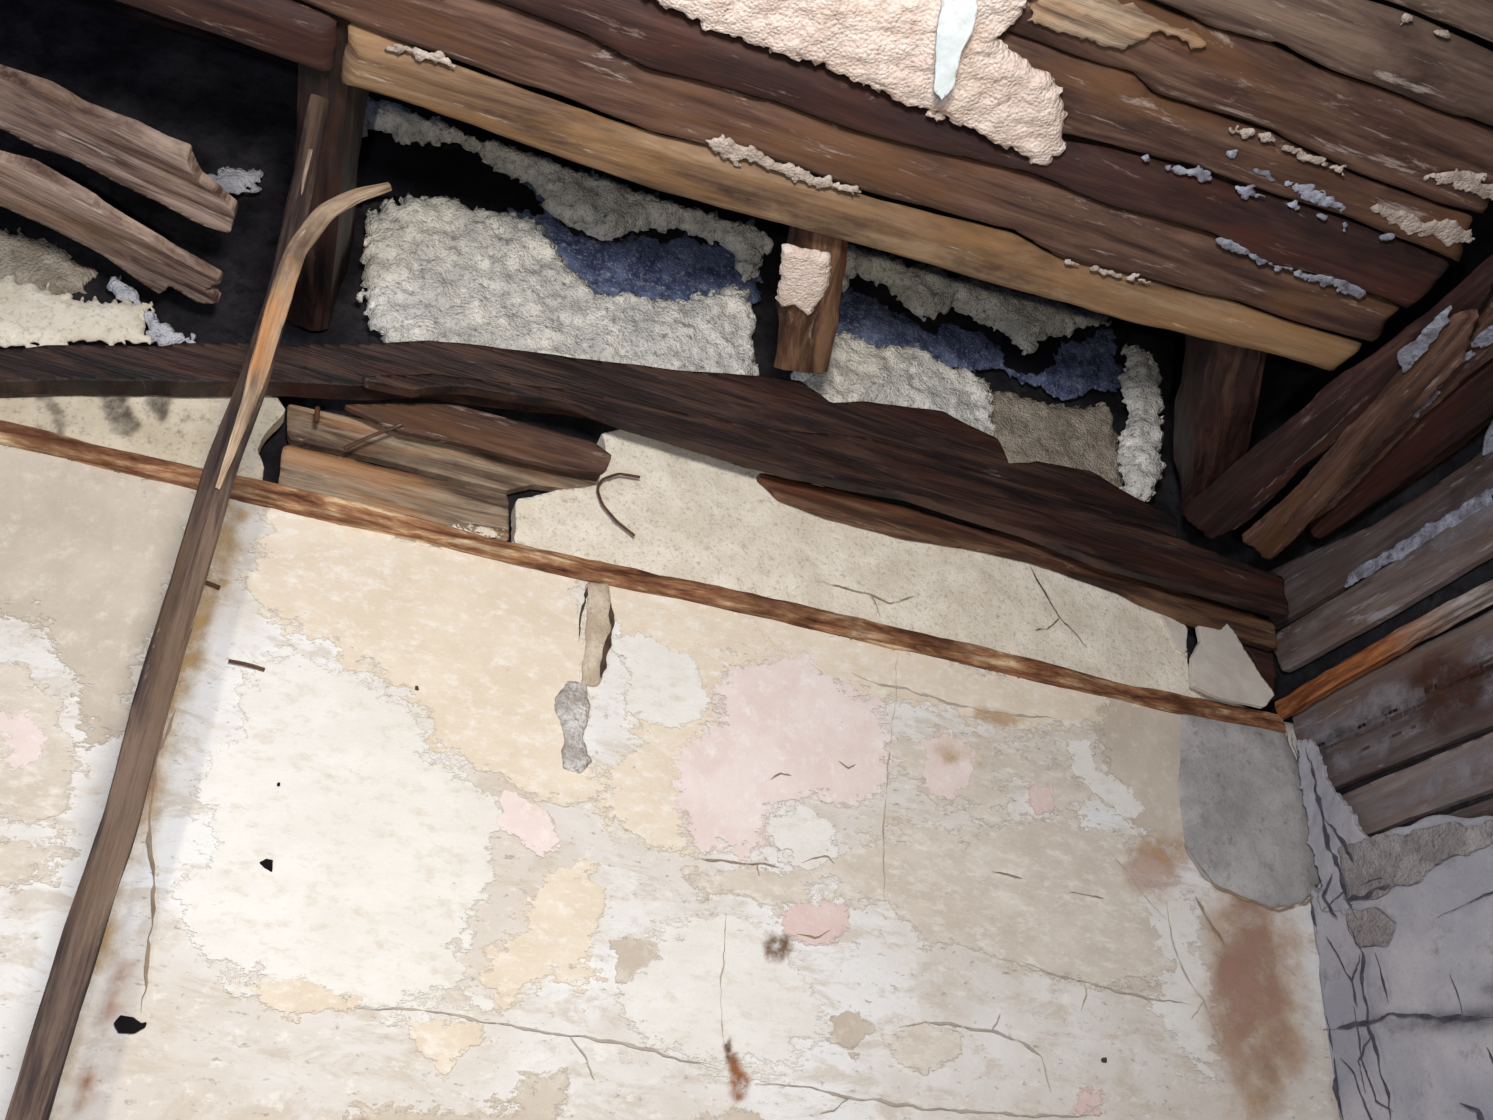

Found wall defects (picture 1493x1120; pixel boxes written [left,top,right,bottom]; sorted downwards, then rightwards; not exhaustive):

spalling [0,395,231,468]
spalling [237,396,285,480]
peeling [0,445,196,893]
peeling [168,430,1274,1088]
crack [852,657,1056,902]
crack [700,858,779,876]
crack [1023,731,1493,1120]
water stain [1217,896,1286,1064]
peeling [342,1067,570,1120]
peeling [695,1105,763,1120]
crack [754,1015,1086,1117]